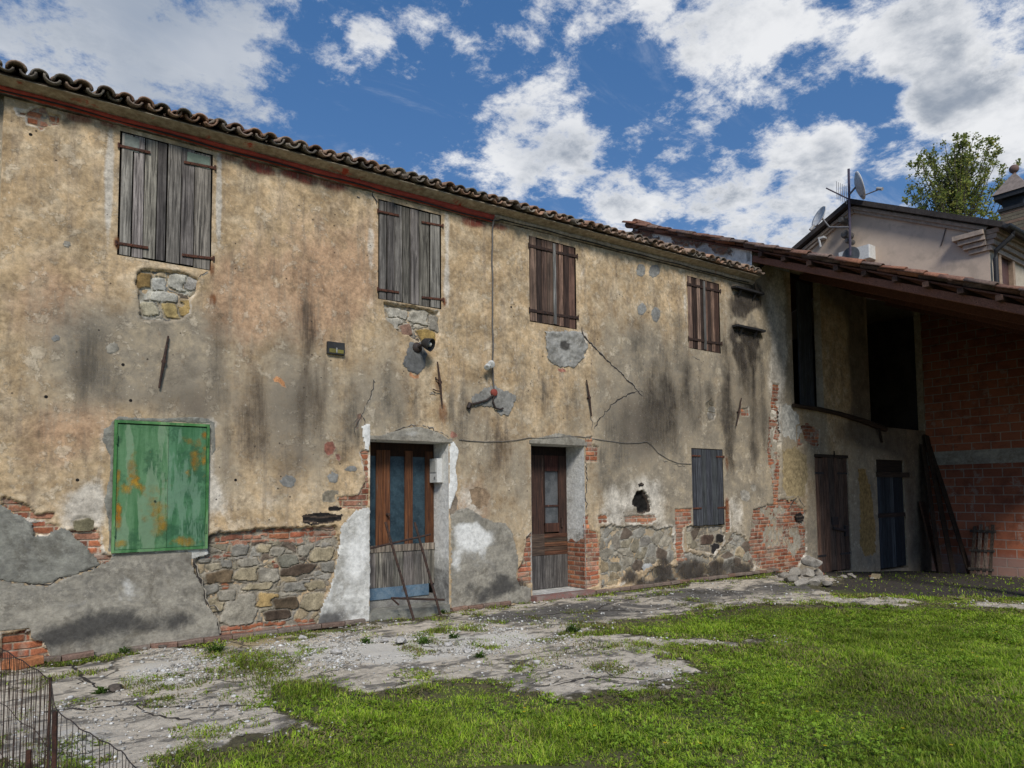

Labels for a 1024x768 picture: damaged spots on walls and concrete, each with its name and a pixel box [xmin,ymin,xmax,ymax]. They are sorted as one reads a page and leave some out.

crack [354,379,375,437]
crack [582,331,643,430]
water stain [722,367,731,444]
flaking render [2,497,111,564]
flaking render [194,451,369,635]
flaking render [324,441,341,461]
flaking render [517,533,531,583]
flaking render [566,515,607,589]
spalling [625,483,656,524]
flaking render [675,508,691,563]
flaking render [740,384,819,572]
flaking render [0,630,49,660]